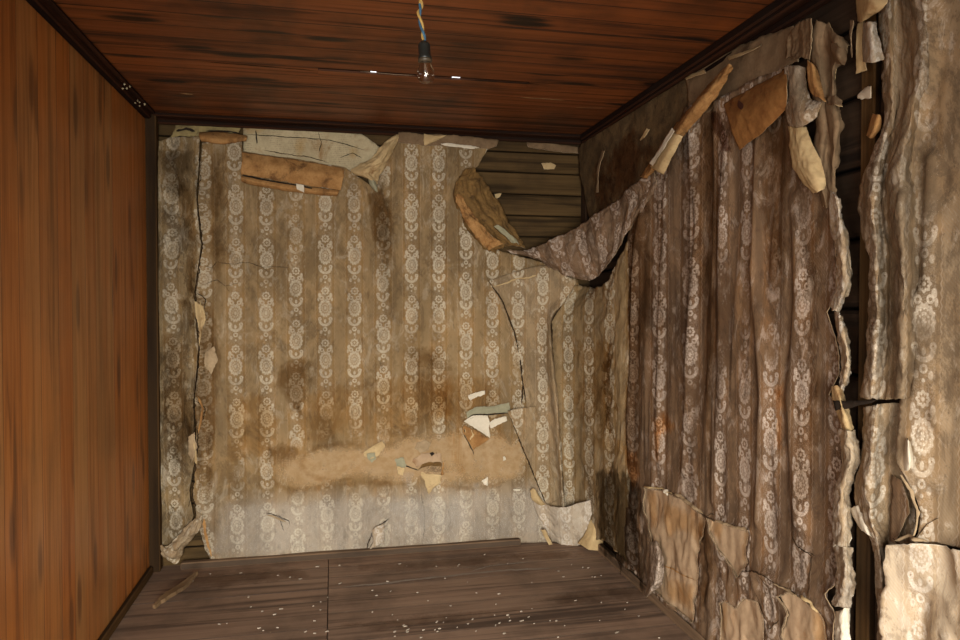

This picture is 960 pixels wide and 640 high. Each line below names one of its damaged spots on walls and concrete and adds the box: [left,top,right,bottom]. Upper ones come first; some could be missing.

peeling [463,391,510,454]
peeling [362,441,385,463]
damp [281,434,524,486]
peeling [395,453,444,494]
damp [598,473,642,587]
peeling [643,486,749,622]
peeling [720,599,764,640]
peeling [772,583,827,640]